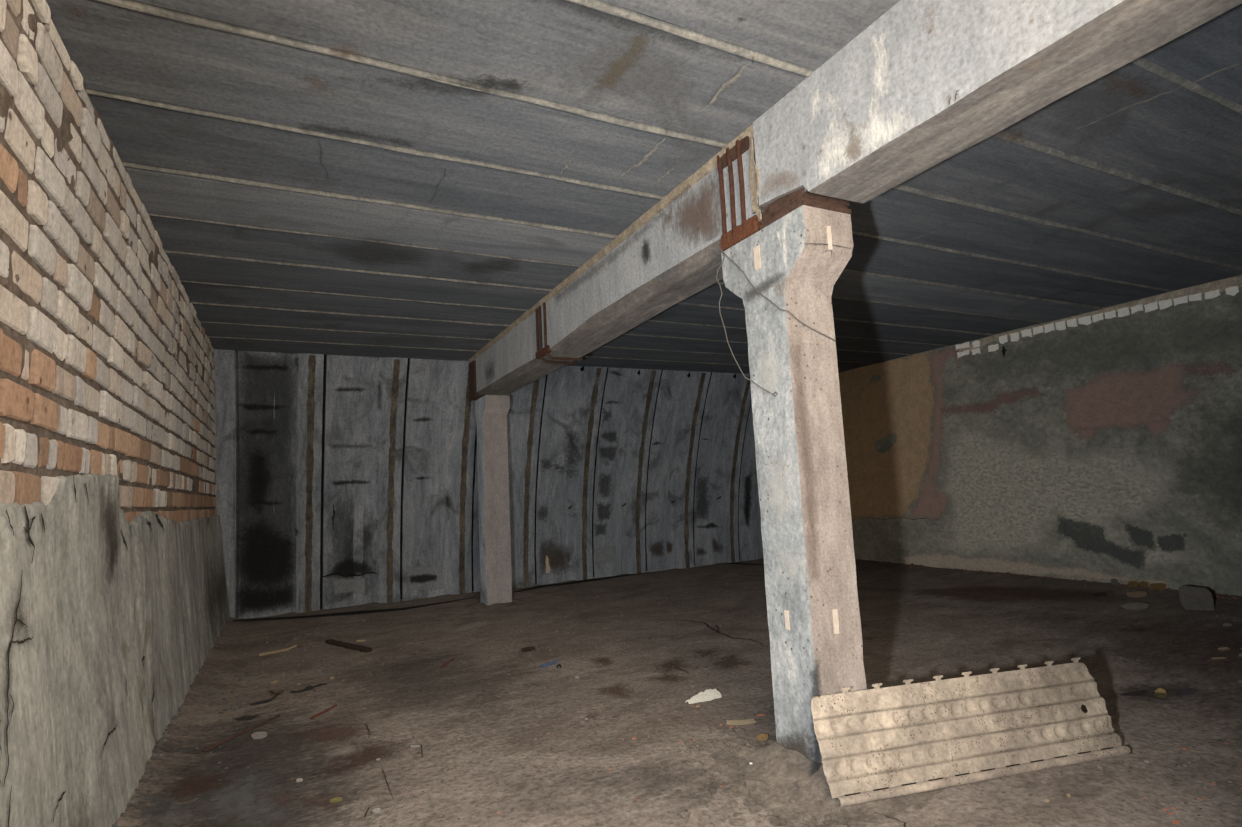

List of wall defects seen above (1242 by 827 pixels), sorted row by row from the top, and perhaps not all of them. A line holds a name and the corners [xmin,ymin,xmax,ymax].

crack [0,506,45,827]
damp [209,526,298,611]